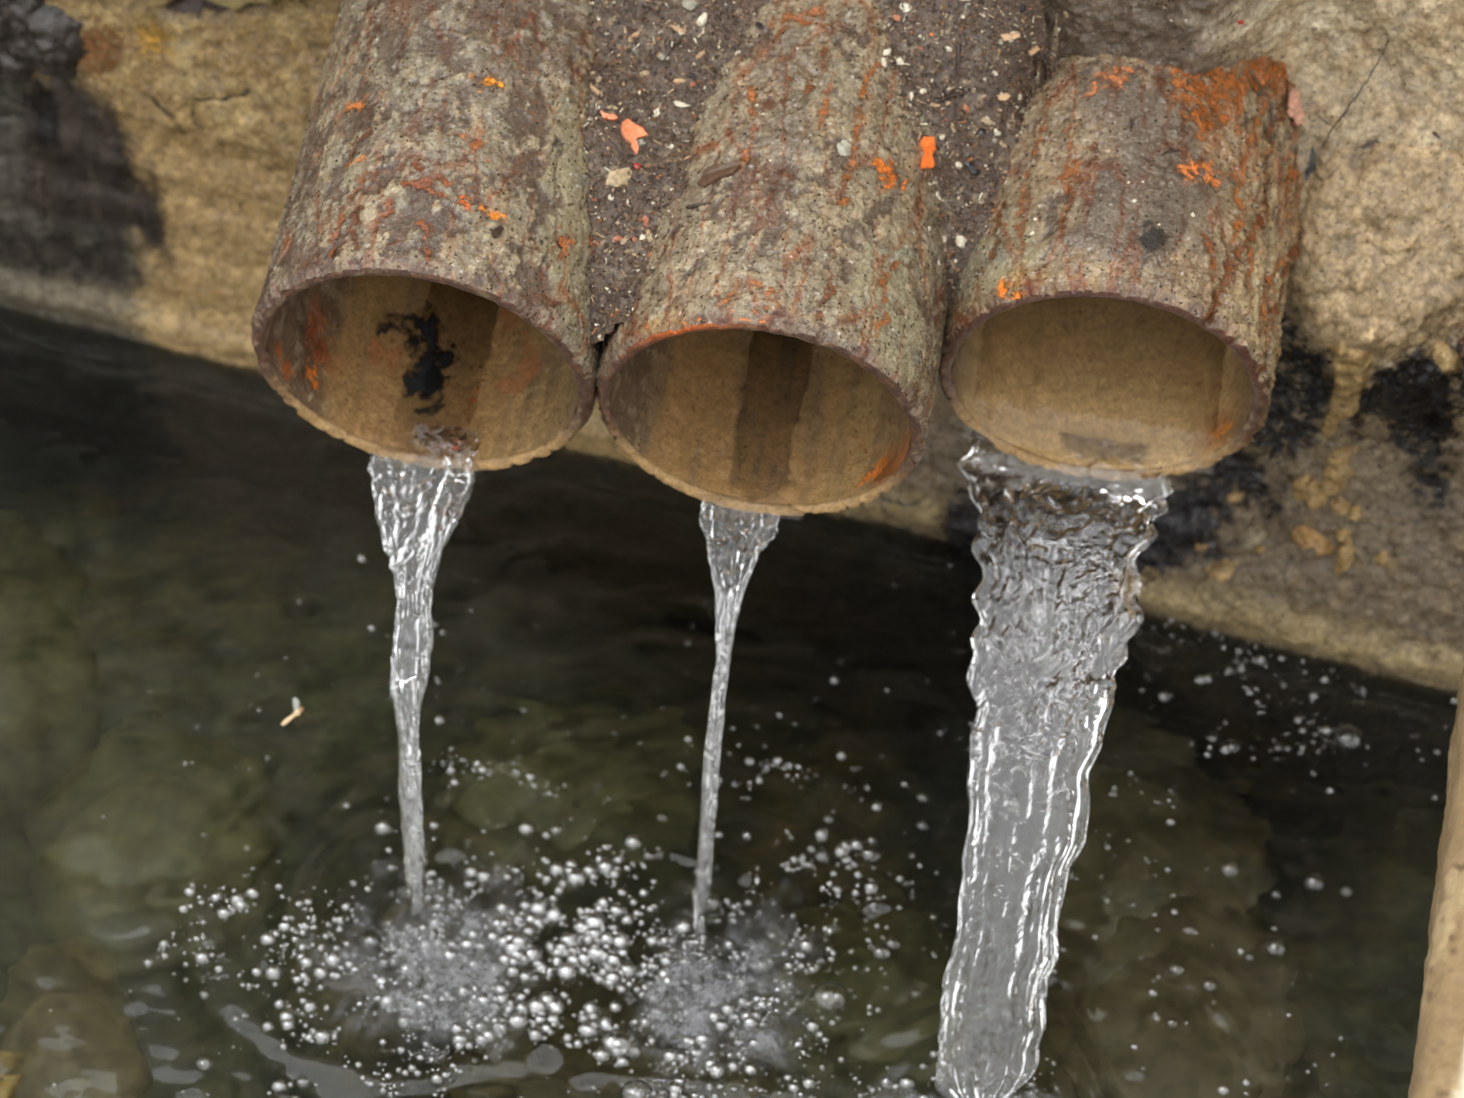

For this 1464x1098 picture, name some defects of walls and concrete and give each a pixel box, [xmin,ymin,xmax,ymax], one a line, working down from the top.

damp [0,77,172,281]
rust [328,94,505,266]
rust [769,3,842,37]
rust [782,46,835,129]
rust [836,60,907,206]
rust [989,123,1098,260]
rust [1072,66,1134,97]
rust [1157,57,1302,335]
rust [816,283,837,321]
rust [997,278,1026,301]
damp [935,313,1334,599]
damp [1342,329,1464,523]